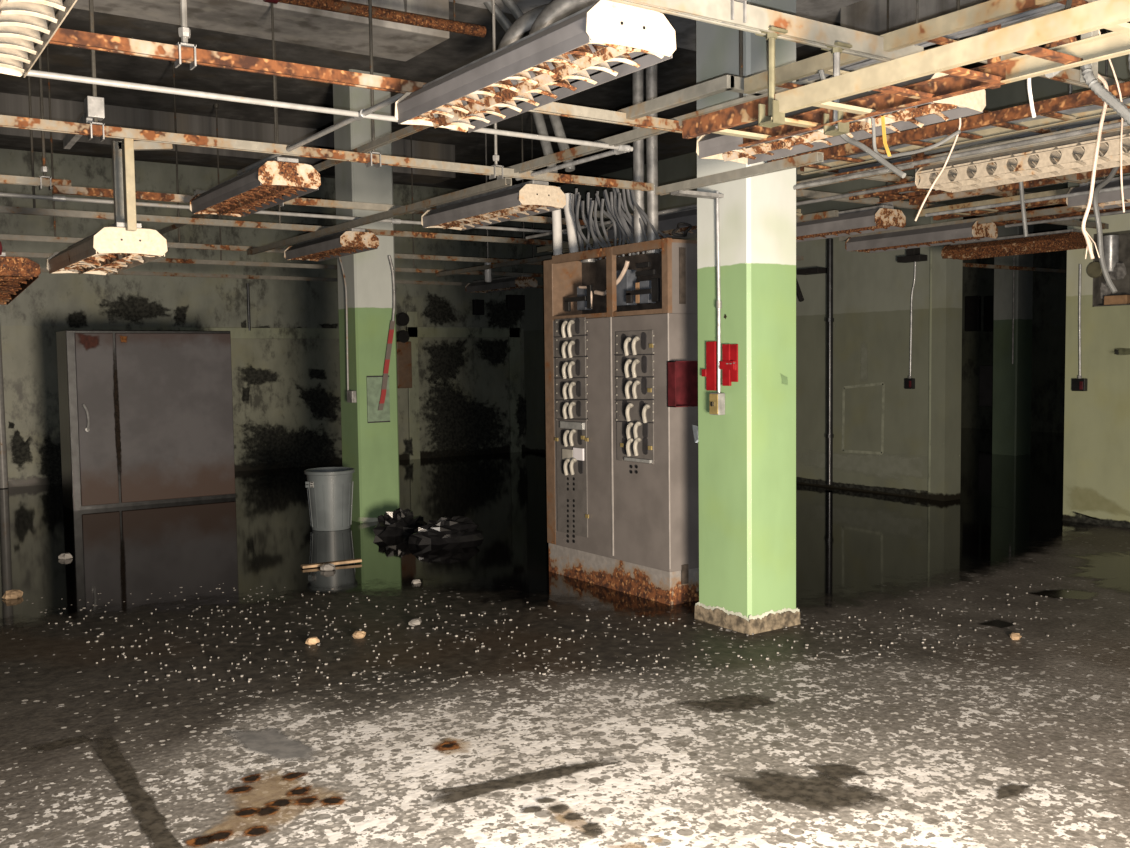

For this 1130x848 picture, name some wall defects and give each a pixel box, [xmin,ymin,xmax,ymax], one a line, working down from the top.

leakage [67,311,88,328]
leakage [100,296,188,325]
leakage [422,293,457,326]
leakage [404,300,527,457]
leakage [234,366,342,468]
leakage [8,422,62,484]
corrosion [186,773,345,847]
leakage [734,765,887,811]